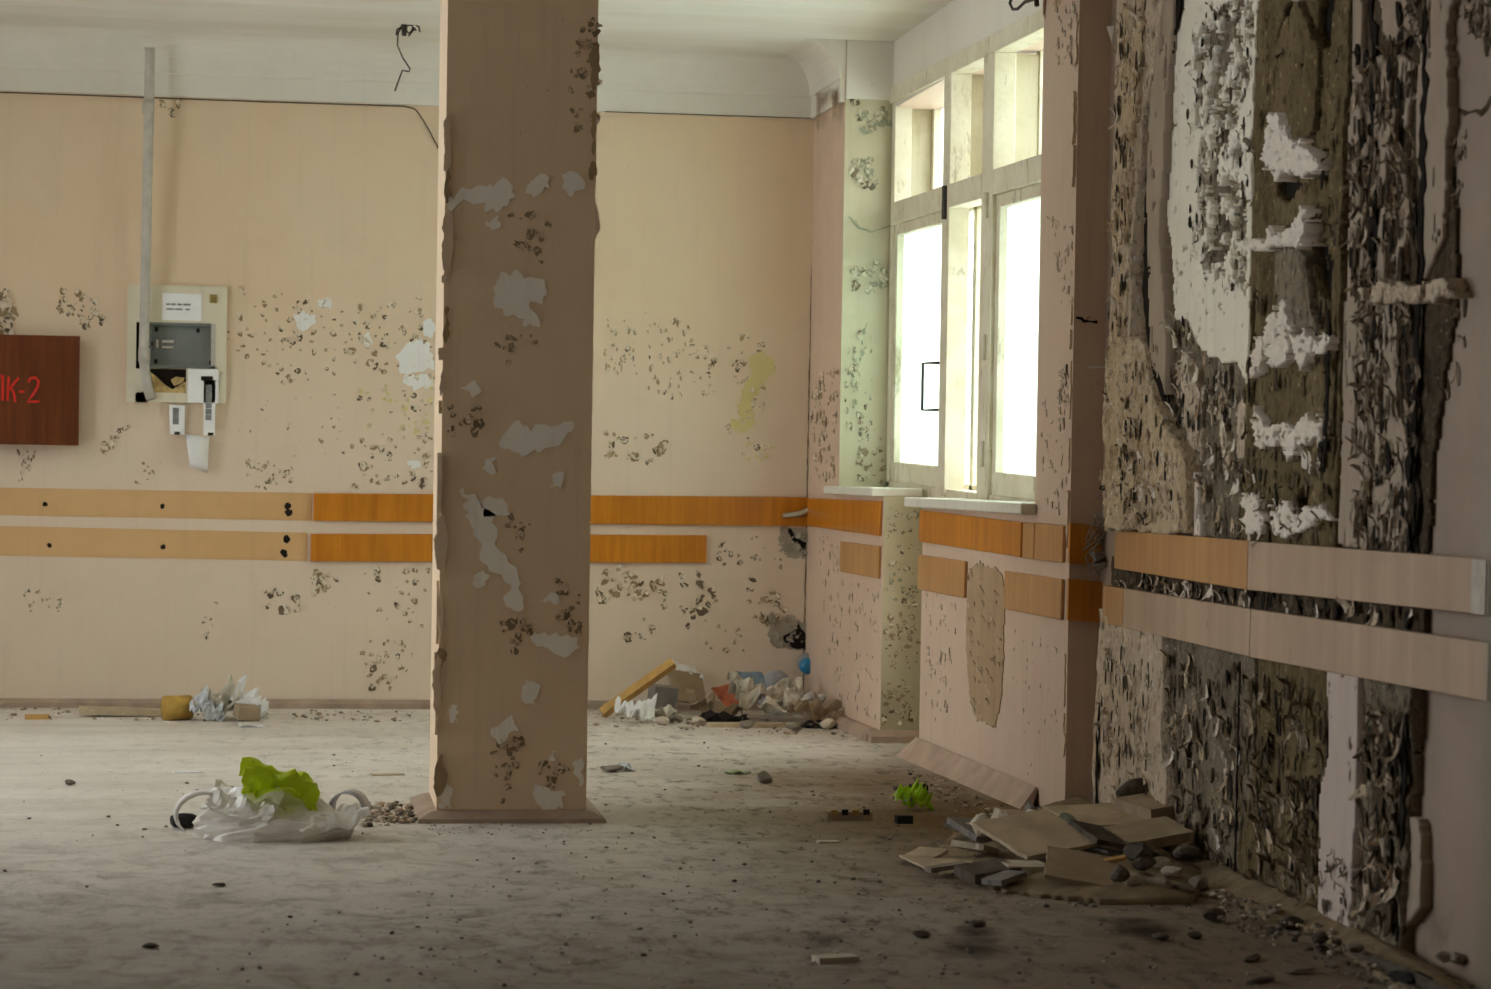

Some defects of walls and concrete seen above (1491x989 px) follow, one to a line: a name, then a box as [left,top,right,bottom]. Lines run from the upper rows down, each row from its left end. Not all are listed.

peeling [850,97,892,134]
flaking render [441,17,603,365]
peeling [848,157,879,191]
peeling [0,288,19,335]
peeling [56,287,106,330]
spalling [150,369,186,393]
spalling [1040,216,1073,548]
flaking render [227,286,1068,757]
spalling [1111,556,1431,634]
flaking render [490,680,541,804]
spalling [433,754,453,809]
peeling [1088,609,1432,955]